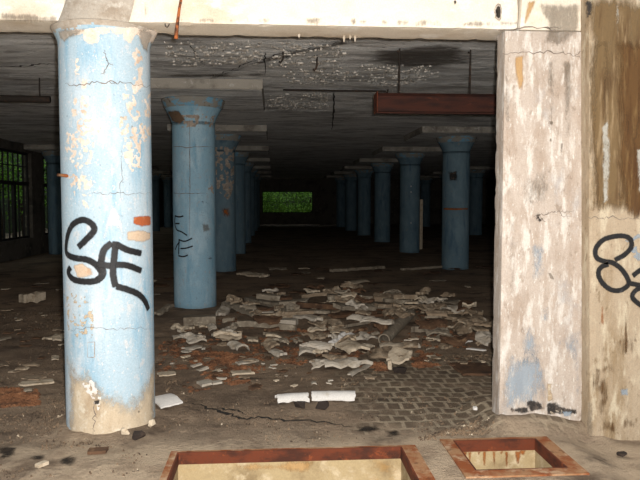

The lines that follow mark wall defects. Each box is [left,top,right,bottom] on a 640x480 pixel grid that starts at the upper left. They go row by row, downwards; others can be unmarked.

peeling [65,58,101,209]
crack [65,50,150,87]
peeling [59,27,157,172]
crack [222,41,340,74]
water stain [164,41,465,111]
crack [329,93,337,129]
crack [503,50,581,59]
water stain [591,0,640,217]
peeling [206,146,235,200]
peeling [70,371,155,435]
crack [191,403,350,427]